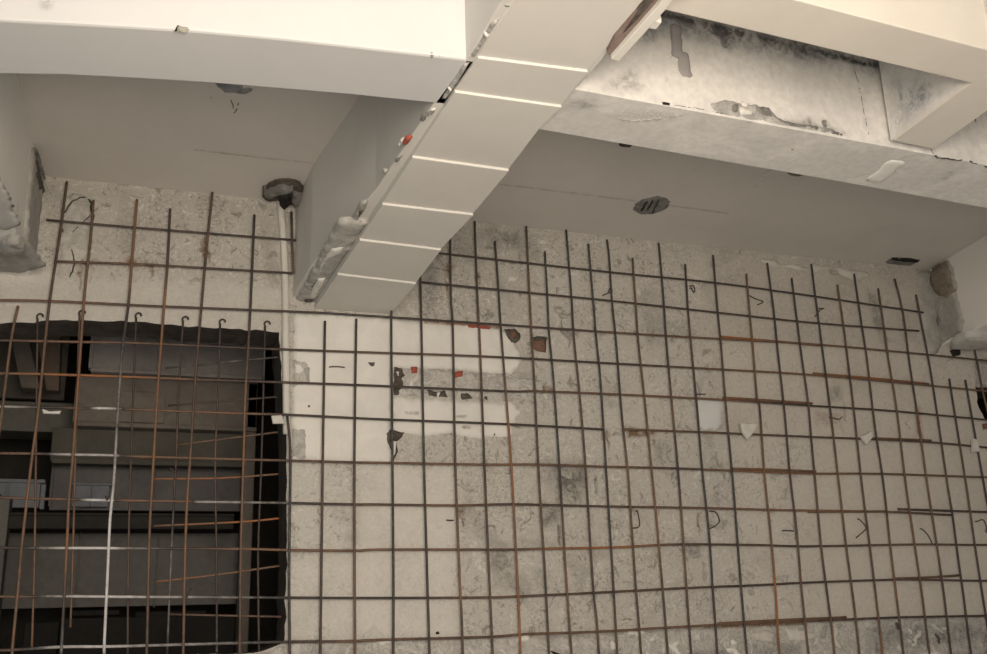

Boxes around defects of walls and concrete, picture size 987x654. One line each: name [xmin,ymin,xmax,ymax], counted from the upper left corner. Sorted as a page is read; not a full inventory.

peeling [667,23,692,78]
spalling [208,82,252,113]
peeling [711,100,842,136]